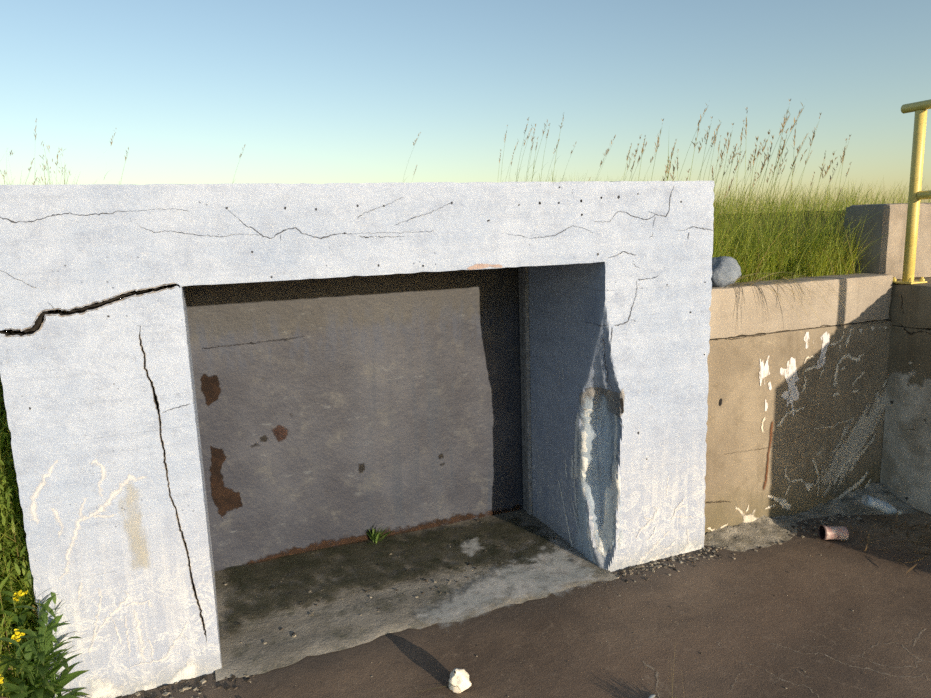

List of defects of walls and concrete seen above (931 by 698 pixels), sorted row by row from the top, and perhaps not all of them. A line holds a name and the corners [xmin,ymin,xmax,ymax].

crack [2,197,452,239]
crack [0,283,180,337]
spalling [579,387,625,417]
crack [137,325,207,642]